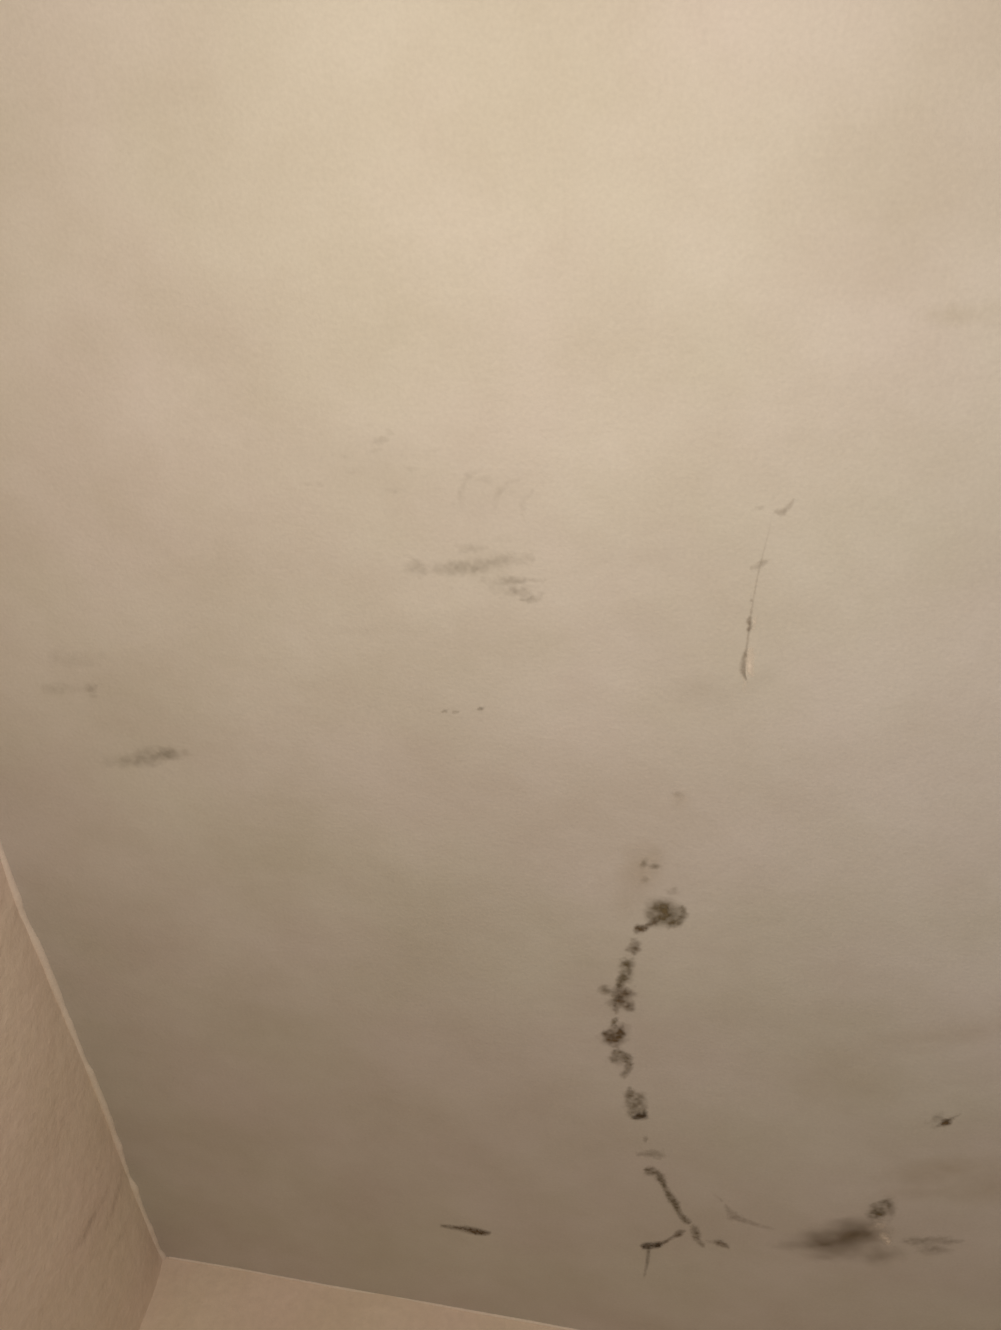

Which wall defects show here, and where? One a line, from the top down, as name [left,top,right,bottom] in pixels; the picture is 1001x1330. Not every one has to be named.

crack [746,655,754,674]
leakage [635,903,683,931]
leakage [615,947,637,1008]
leakage [603,1021,625,1053]
crack [643,1169,719,1249]